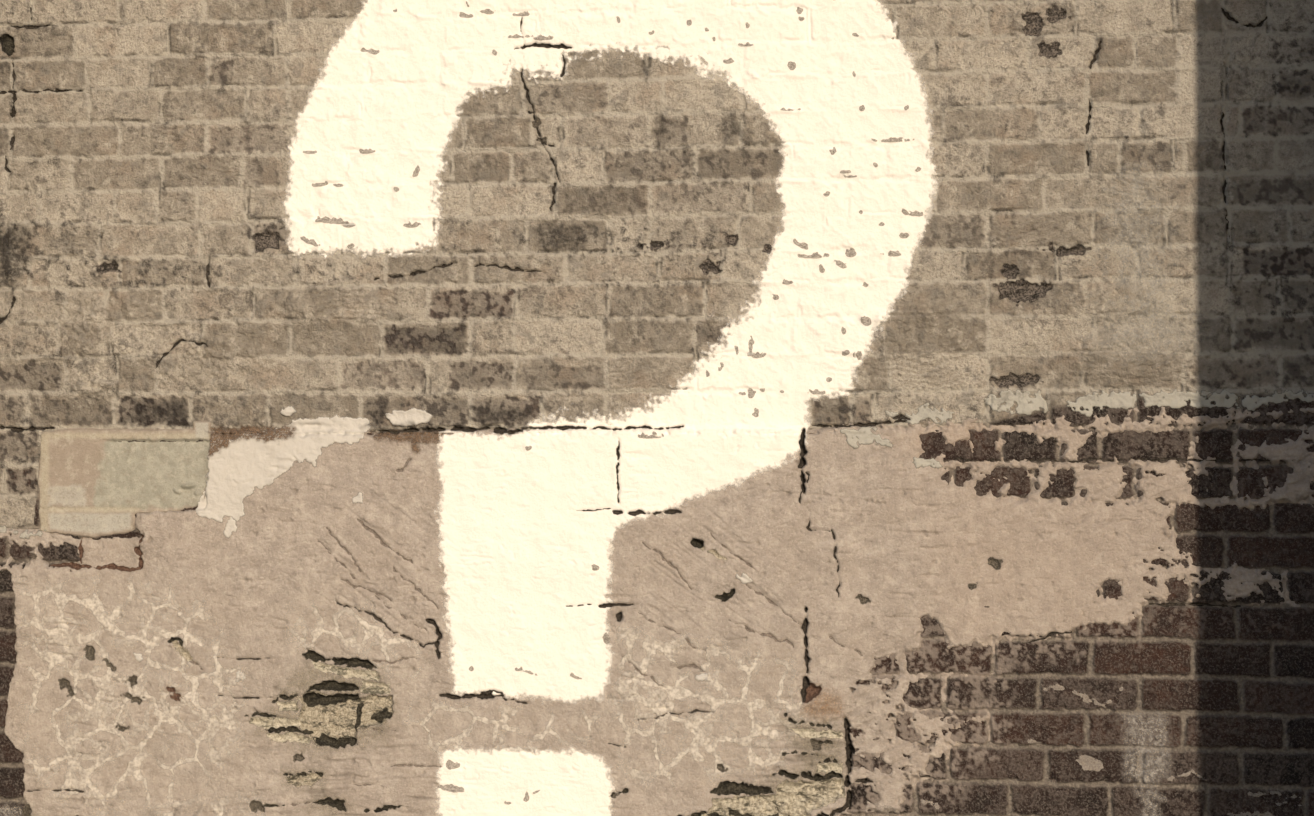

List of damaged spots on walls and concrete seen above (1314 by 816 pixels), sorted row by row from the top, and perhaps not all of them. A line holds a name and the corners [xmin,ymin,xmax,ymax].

crack [0,63,83,173]
crack [514,18,572,211]
peeling [984,372,1049,415]
peeling [1067,389,1314,417]
crack [378,425,684,516]
crack [798,414,911,597]
flaking render [250,800,285,813]
flaking render [245,650,393,787]
flaking render [313,797,346,812]
crack [293,601,822,780]
flaking render [677,713,846,816]
crack [817,718,873,816]